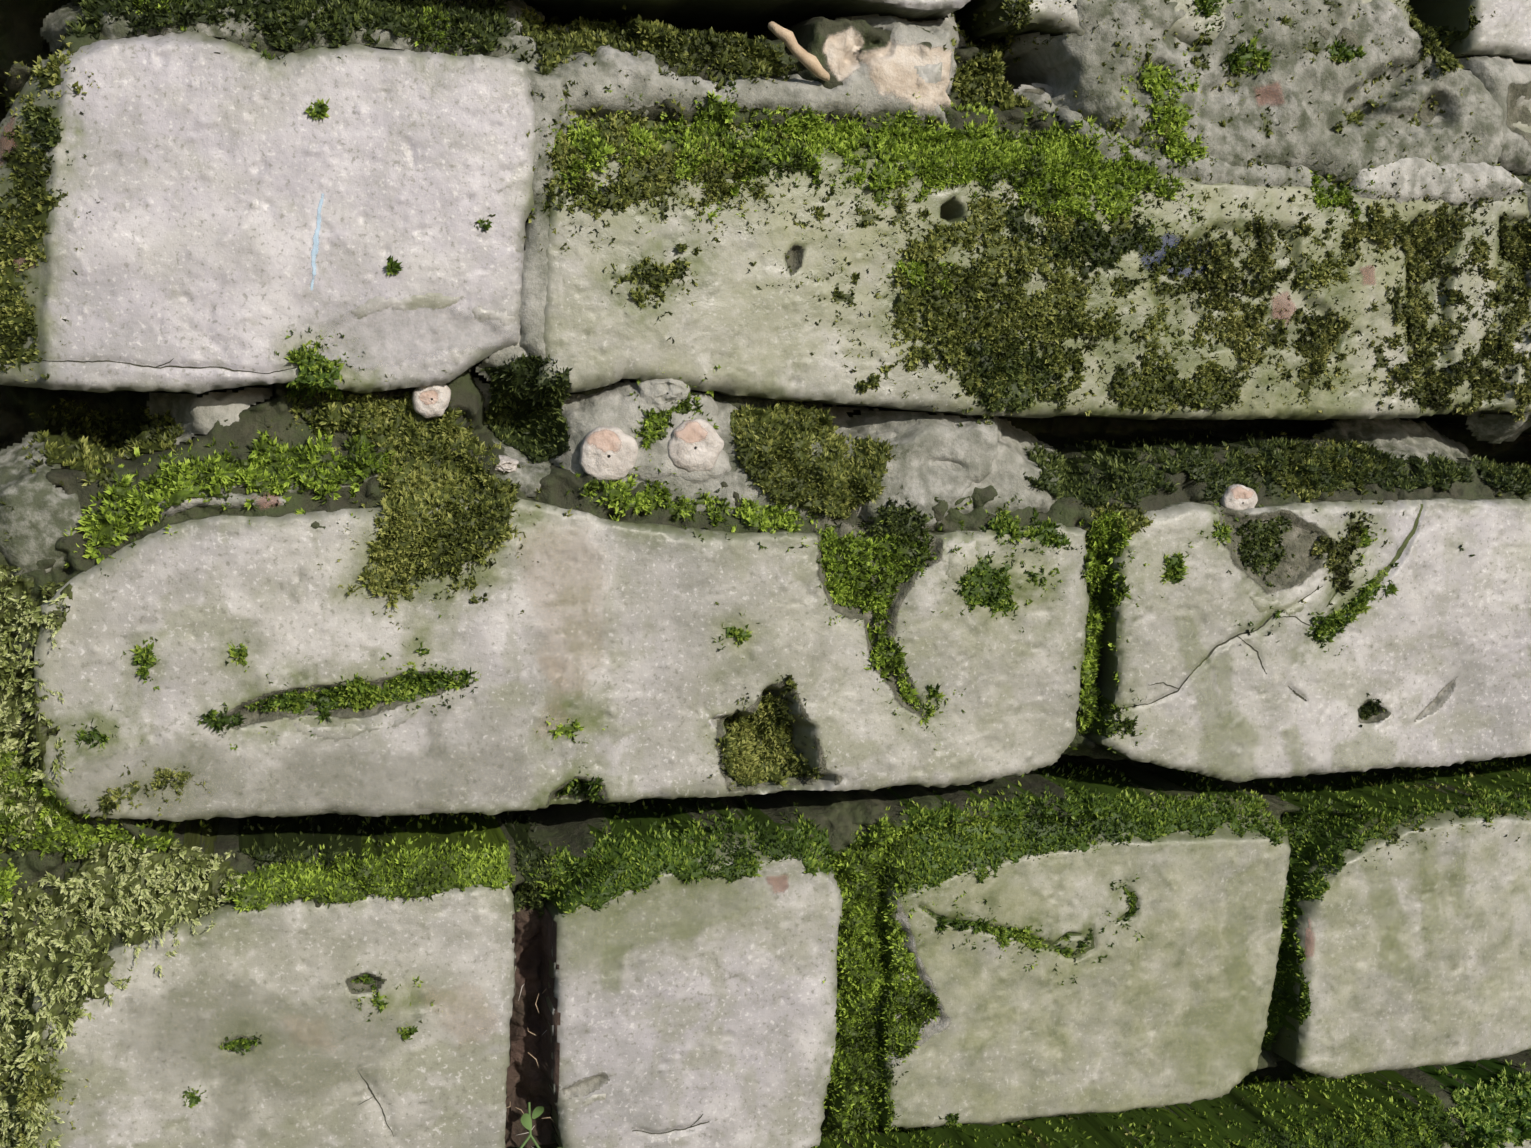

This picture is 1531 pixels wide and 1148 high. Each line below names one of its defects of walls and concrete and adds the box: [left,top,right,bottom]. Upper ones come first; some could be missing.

crack [1121,504,1423,709]